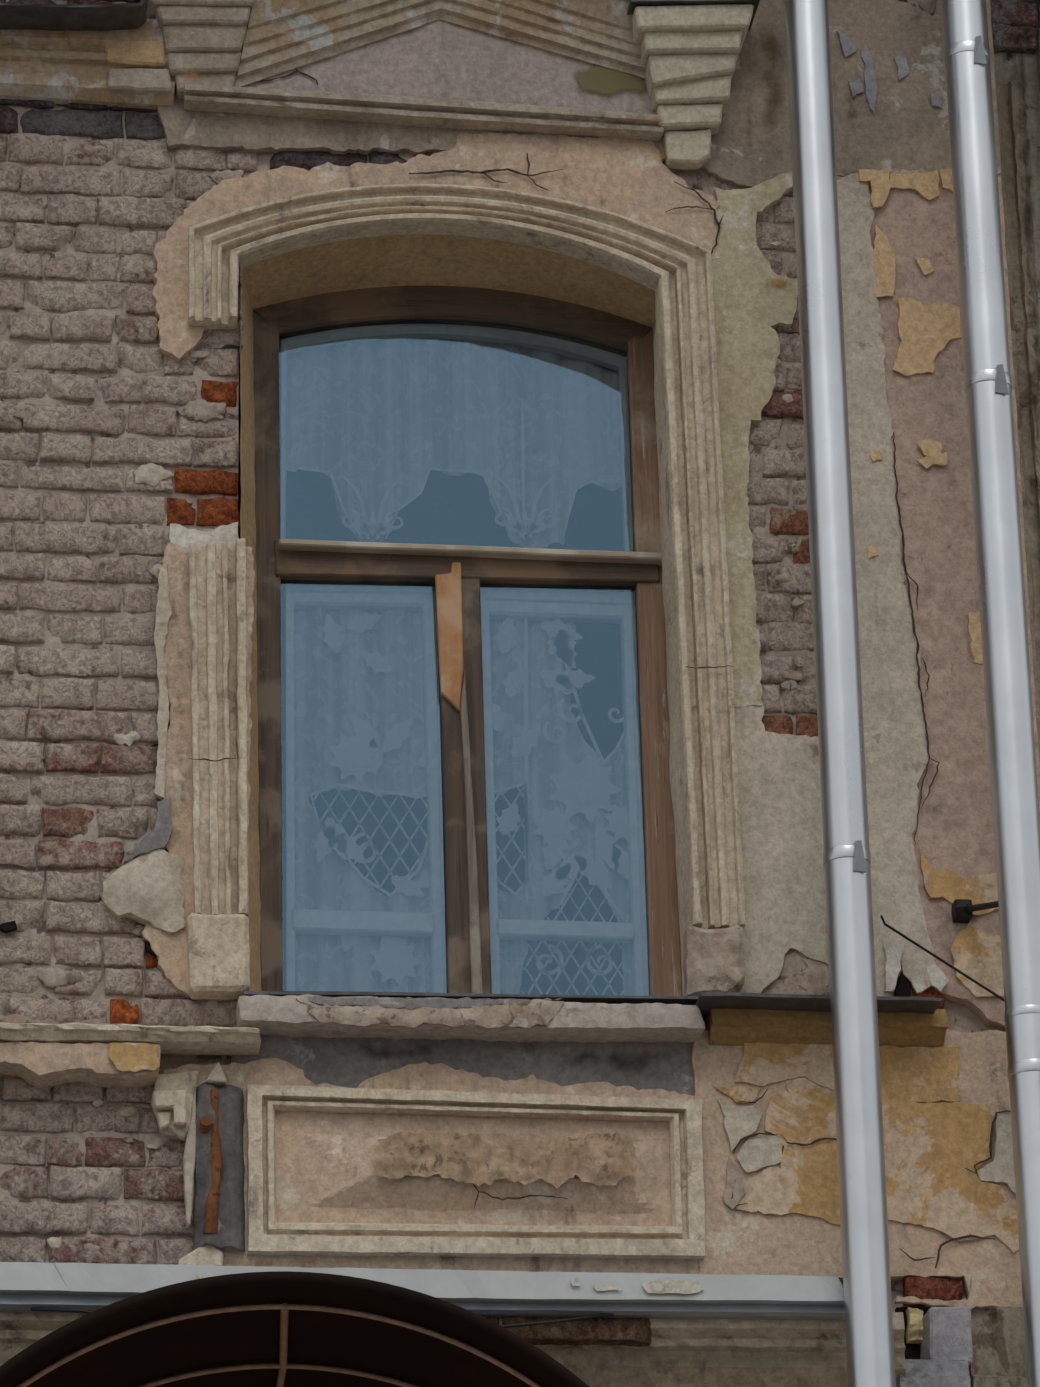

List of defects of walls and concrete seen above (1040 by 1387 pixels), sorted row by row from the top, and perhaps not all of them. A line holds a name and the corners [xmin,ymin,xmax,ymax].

crack [409,153,563,191]
crack [666,181,723,254]
spalling [756,190,797,278]
peeling [858,168,962,376]
damp [1024,140,1033,238]
spalling [0,99,407,1027]
spalling [747,298,818,737]
crack [893,432,940,844]
peeling [968,612,983,665]
spalling [0,1042,194,1265]
peeling [713,1043,841,1225]
peeling [879,1045,1019,1253]